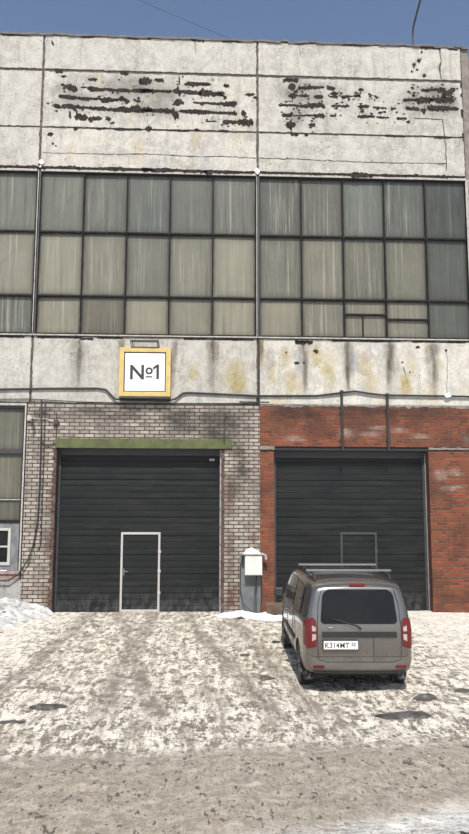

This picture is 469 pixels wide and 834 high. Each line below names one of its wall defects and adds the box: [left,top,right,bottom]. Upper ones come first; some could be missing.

peeling [47,68,254,133]
peeling [278,47,464,137]